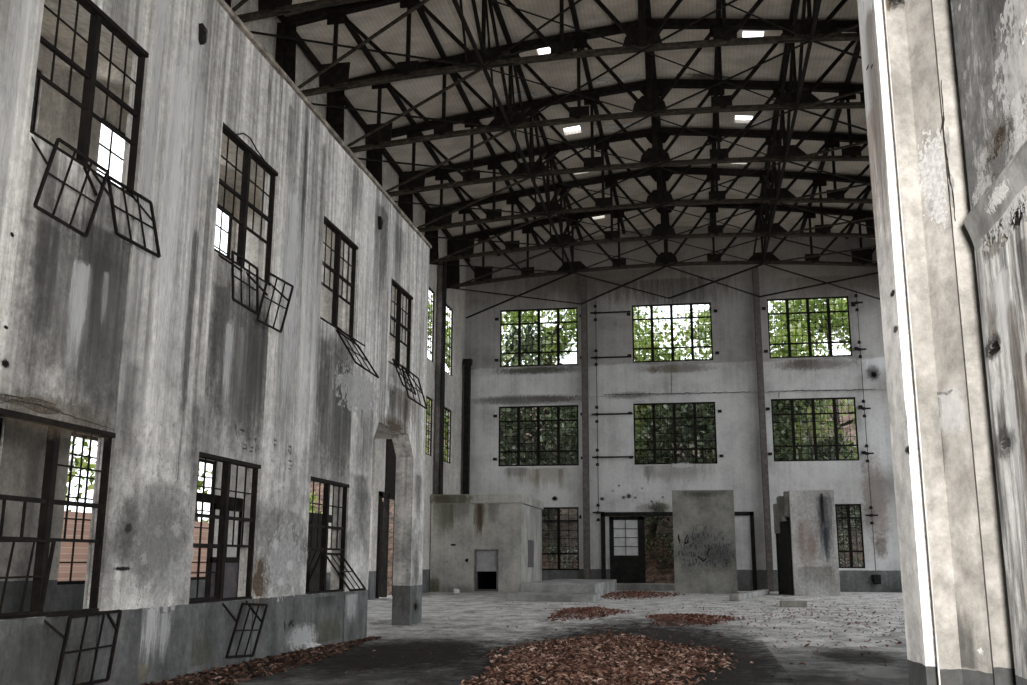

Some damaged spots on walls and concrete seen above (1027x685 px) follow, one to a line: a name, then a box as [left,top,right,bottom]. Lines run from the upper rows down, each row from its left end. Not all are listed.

peeling [972,0,1027,207]
peeling [977,186,1027,254]